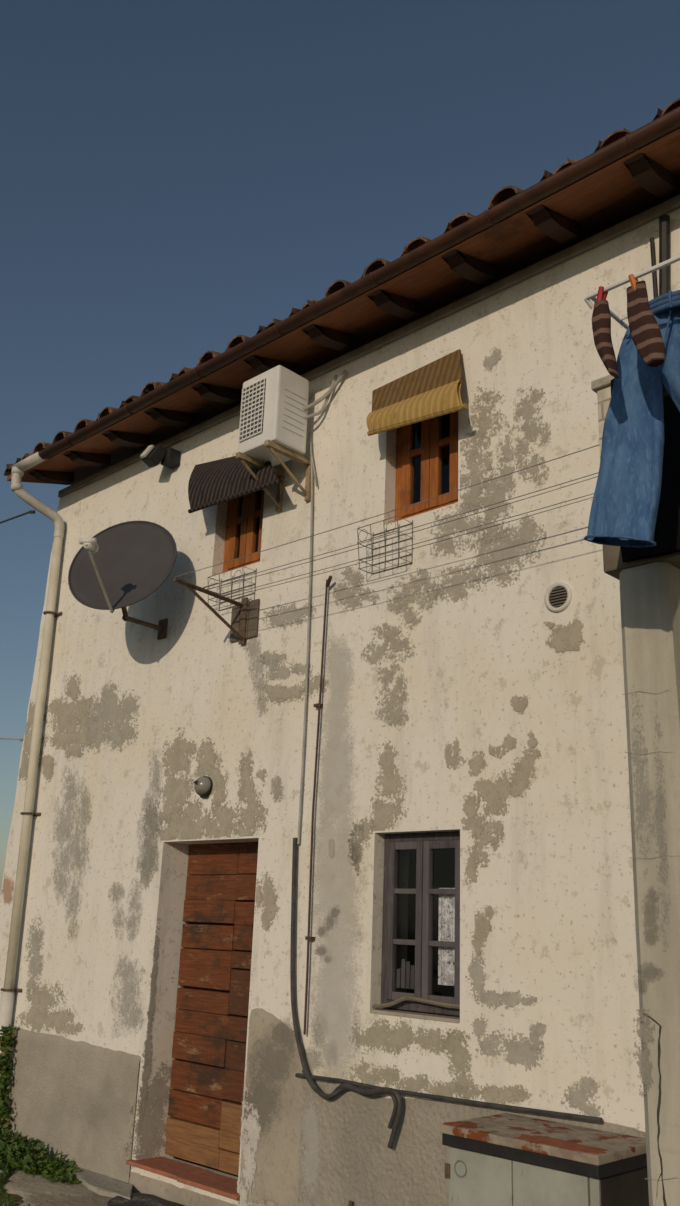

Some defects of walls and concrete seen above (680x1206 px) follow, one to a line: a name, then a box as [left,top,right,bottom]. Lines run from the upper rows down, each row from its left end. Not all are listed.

peeling [483,348,502,372]
peeling [19,674,145,785]
peeling [263,602,316,632]
peeling [259,650,328,705]
peeling [328,386,551,885]
peeling [544,619,585,653]
peeling [140,727,284,889]
peeling [13,917,85,1037]
peeling [350,905,546,1105]
crack [640,1011,675,1206]